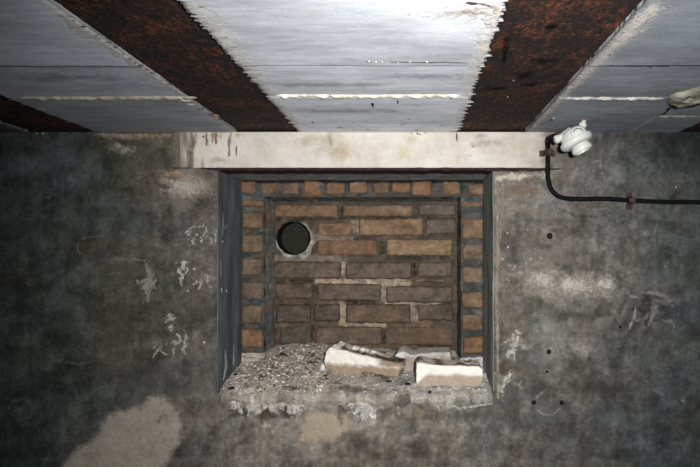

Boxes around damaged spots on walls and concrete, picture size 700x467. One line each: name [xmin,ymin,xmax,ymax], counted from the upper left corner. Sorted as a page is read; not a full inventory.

damp [185,214,227,245]
damp [124,258,158,304]
damp [175,261,212,292]
damp [529,270,614,307]
damp [153,313,188,358]